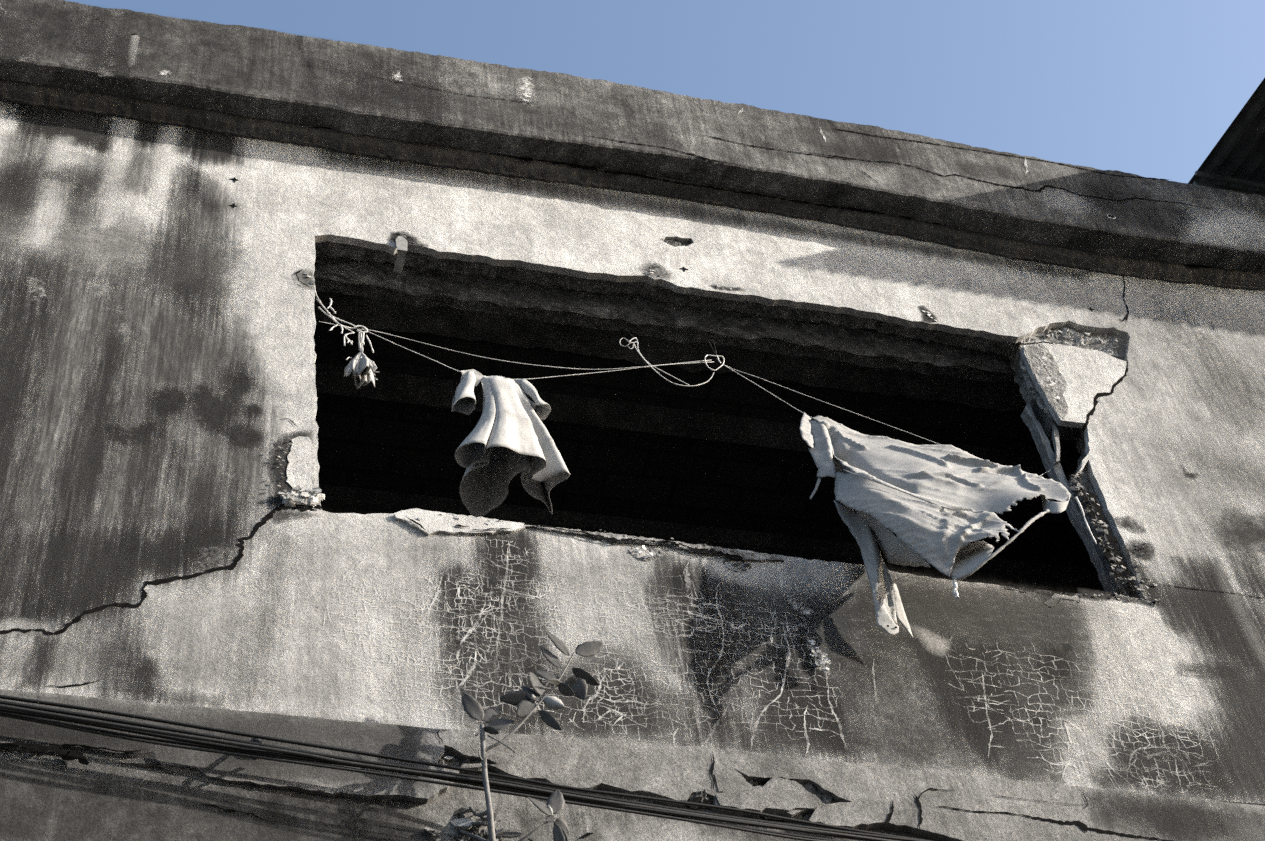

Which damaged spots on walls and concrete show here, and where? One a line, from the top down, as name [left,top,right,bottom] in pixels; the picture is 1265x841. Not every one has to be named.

crack [476,111,1211,226]
crack [1184,263,1245,271]
spalling [1019,327,1127,419]
spalling [268,432,325,507]
crack [0,504,323,635]
spalling [1002,471,1161,607]
crack [323,519,839,753]
crack [708,752,716,790]
spalling [756,783,838,821]
crack [886,644,1216,841]